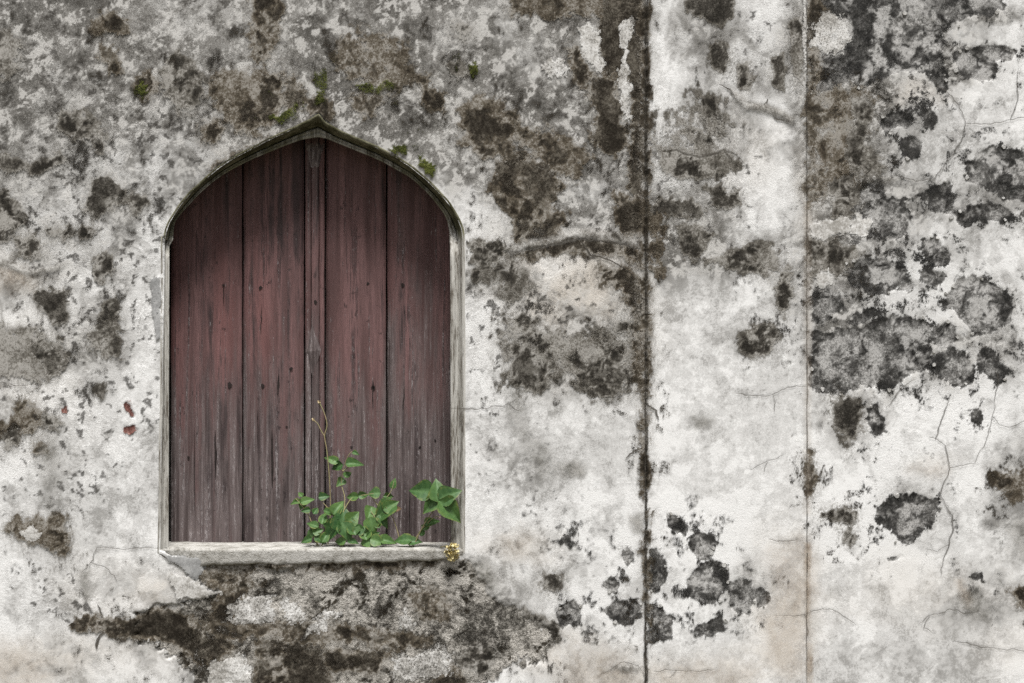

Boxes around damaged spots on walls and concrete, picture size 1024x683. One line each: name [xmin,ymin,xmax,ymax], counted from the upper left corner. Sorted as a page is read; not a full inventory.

leakage [0,14,38,101]
leakage [79,0,335,172]
crack [874,68,1024,182]
leakage [1,499,90,597]
leakage [0,103,165,463]
spalling [123,400,137,435]
spalling [135,494,790,683]
leakage [323,0,899,683]
crack [928,369,1024,575]